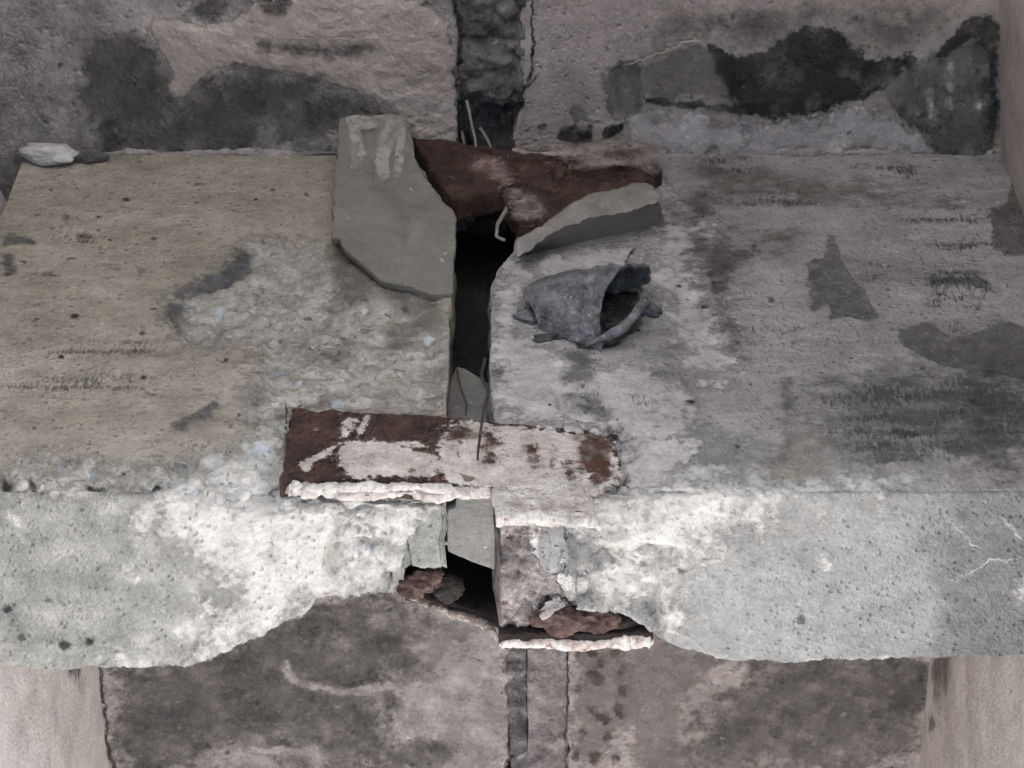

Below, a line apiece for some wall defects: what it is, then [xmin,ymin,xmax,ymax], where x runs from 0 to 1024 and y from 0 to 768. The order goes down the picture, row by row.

damp [257,41,375,57]
damp [707,44,727,65]
damp [643,97,770,116]
damp [973,39,1000,143]
corrosion [467,155,535,210]
damp [673,164,906,291]
spalling [157,233,639,497]
corrosion [442,420,503,463]
corrosion [525,432,617,484]